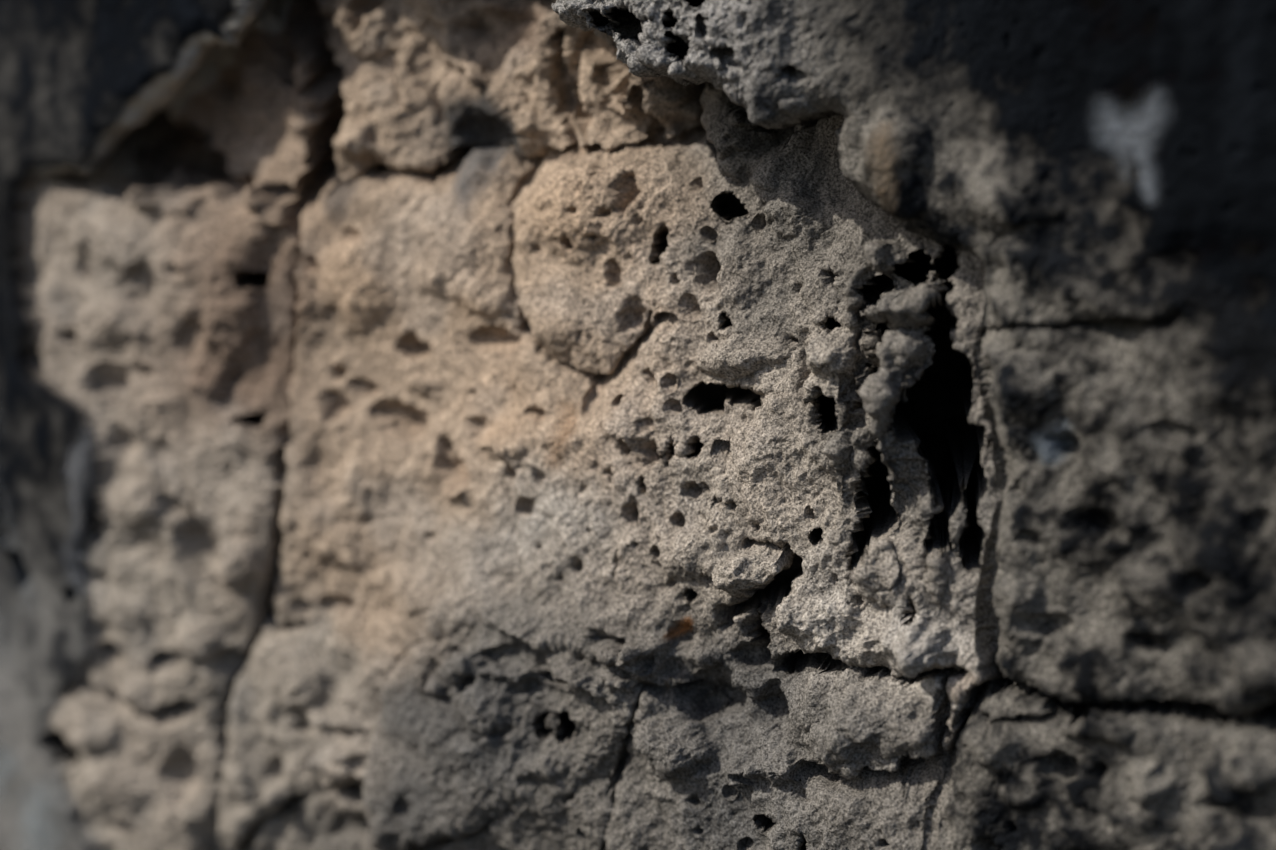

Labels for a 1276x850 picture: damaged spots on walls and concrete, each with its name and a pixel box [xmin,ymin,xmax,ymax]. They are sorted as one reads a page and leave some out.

spalling [11,0,1007,850]
crack [260,597,310,639]
crack [233,777,364,850]
crack [600,679,716,850]
crack [712,537,1276,850]